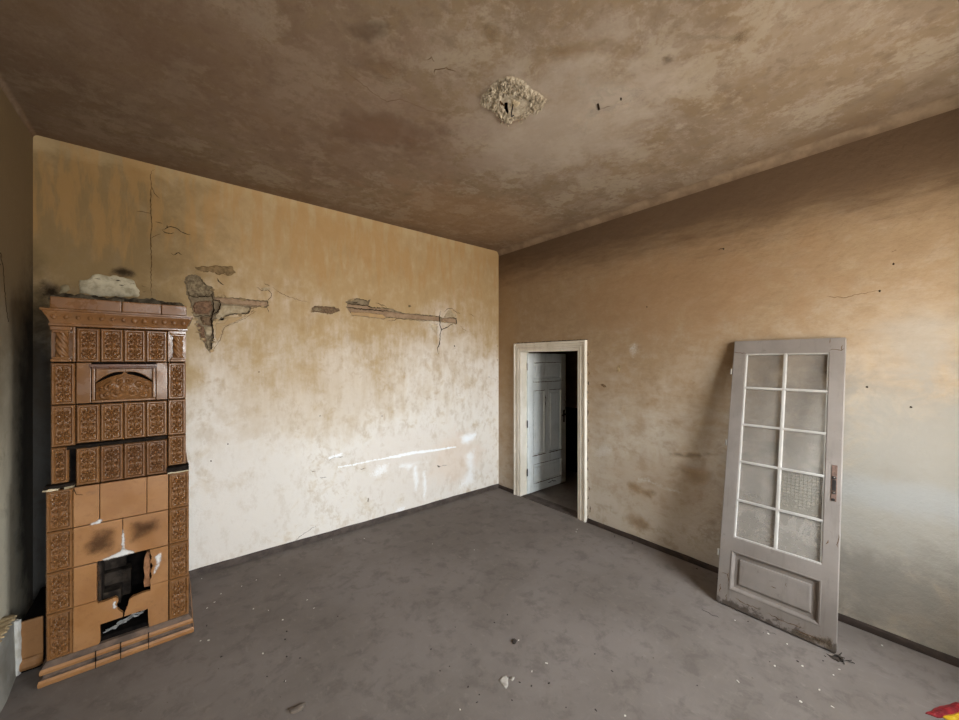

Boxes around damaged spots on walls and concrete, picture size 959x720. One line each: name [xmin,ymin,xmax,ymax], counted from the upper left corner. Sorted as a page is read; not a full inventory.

crack [139,170,189,295]
spalling [183,265,269,352]
spalling [311,298,457,325]